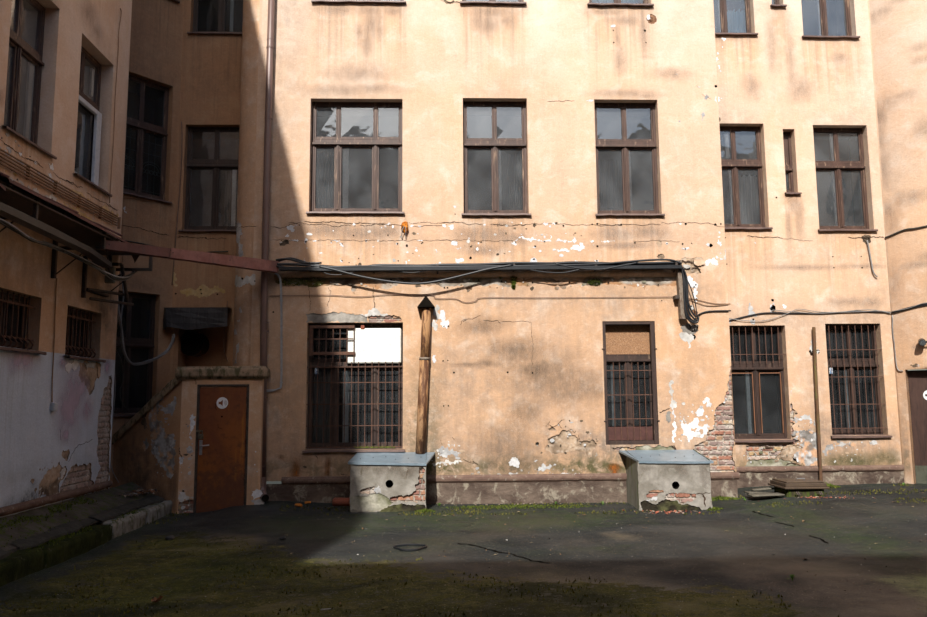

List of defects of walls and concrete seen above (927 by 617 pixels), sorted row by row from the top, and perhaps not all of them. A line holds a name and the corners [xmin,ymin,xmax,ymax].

flaking render [279,225,344,249]
flaking render [365,223,423,264]
flaking render [442,206,610,263]
flaking render [274,274,677,294]
flaking render [679,223,727,348]
flaking render [361,308,402,323]
peeling [431,305,449,331]
flaking render [30,359,112,507]
flaking render [612,367,880,472]
flaking render [141,396,196,513]
flaking render [640,490,711,511]